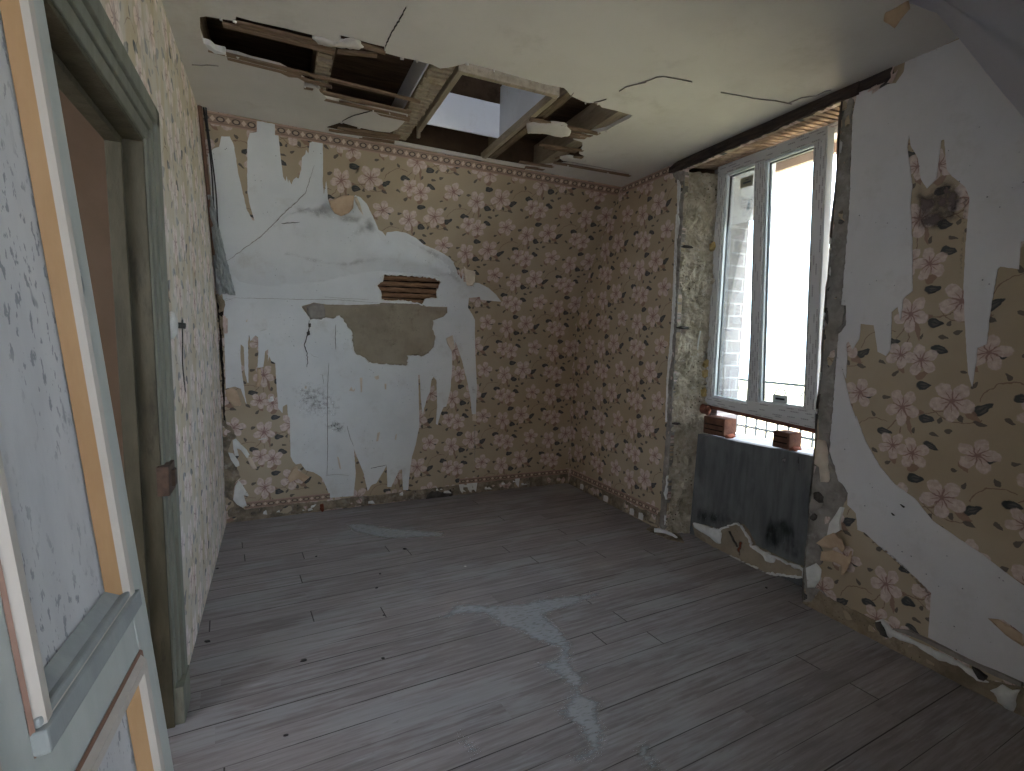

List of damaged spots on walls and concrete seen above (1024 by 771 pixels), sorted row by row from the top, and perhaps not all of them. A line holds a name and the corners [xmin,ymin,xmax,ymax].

crack [385,7,406,47]
crack [570,76,692,103]
crack [721,90,831,105]
water stain [918,184,959,227]
crack [256,297,373,476]
peeling [208,121,689,530]
peeling [692,39,1024,717]
water stain [446,594,602,761]